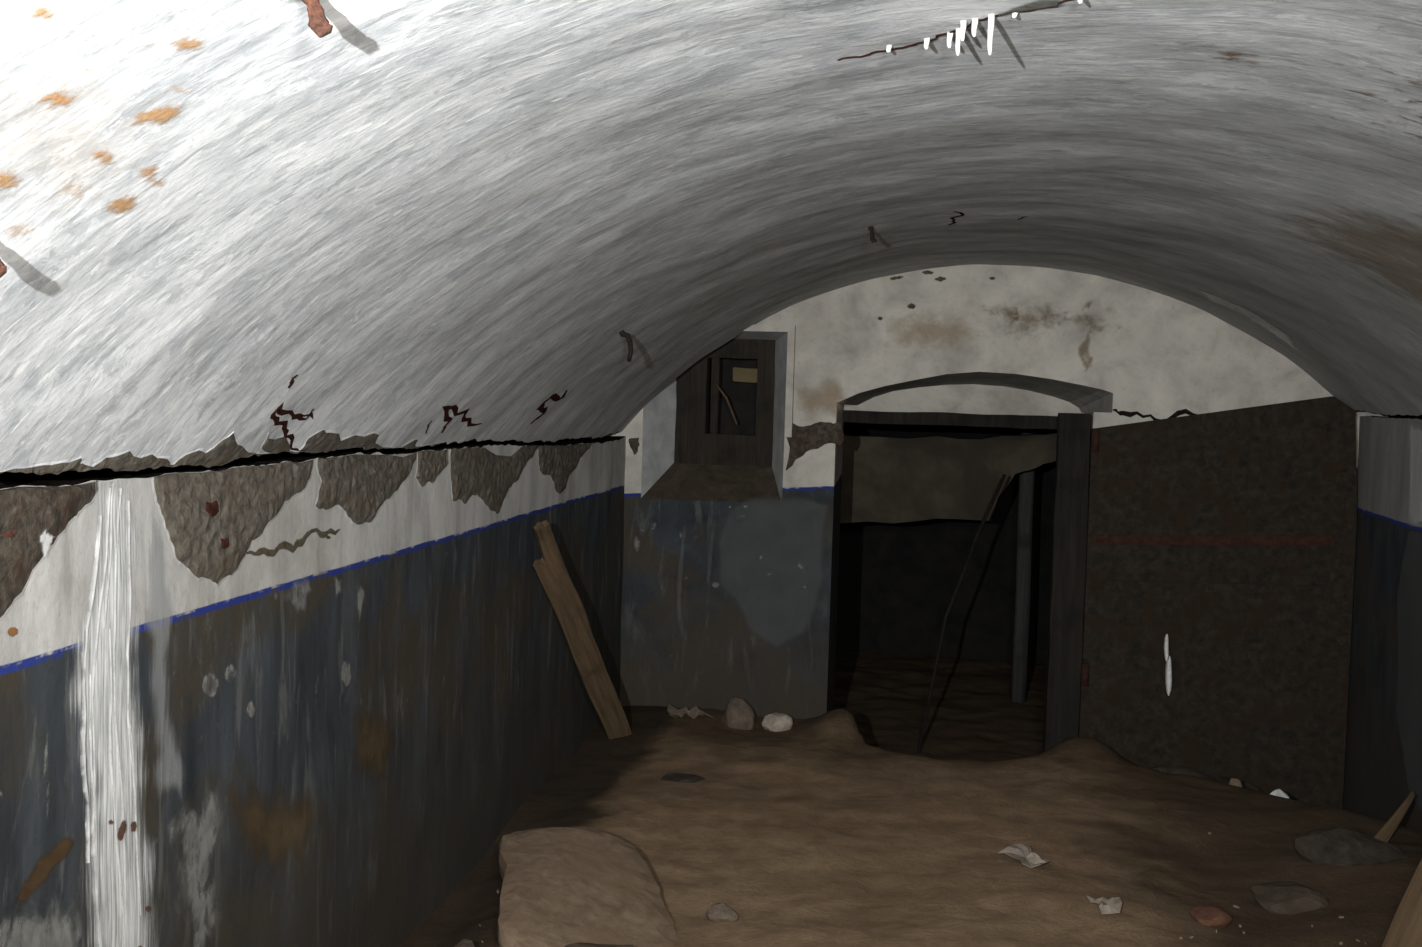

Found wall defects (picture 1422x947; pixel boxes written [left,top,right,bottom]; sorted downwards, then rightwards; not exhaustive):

corrosion [32,8,53,18]
corrosion [169,37,201,50]
corrosion [0,173,17,188]
corrosion [108,197,136,213]
crack [1356,410,1422,420]
crack [0,375,625,489]
flaking render [0,428,599,636]
peeling [202,665,236,697]
peeling [341,661,351,687]
leakage [75,484,151,947]